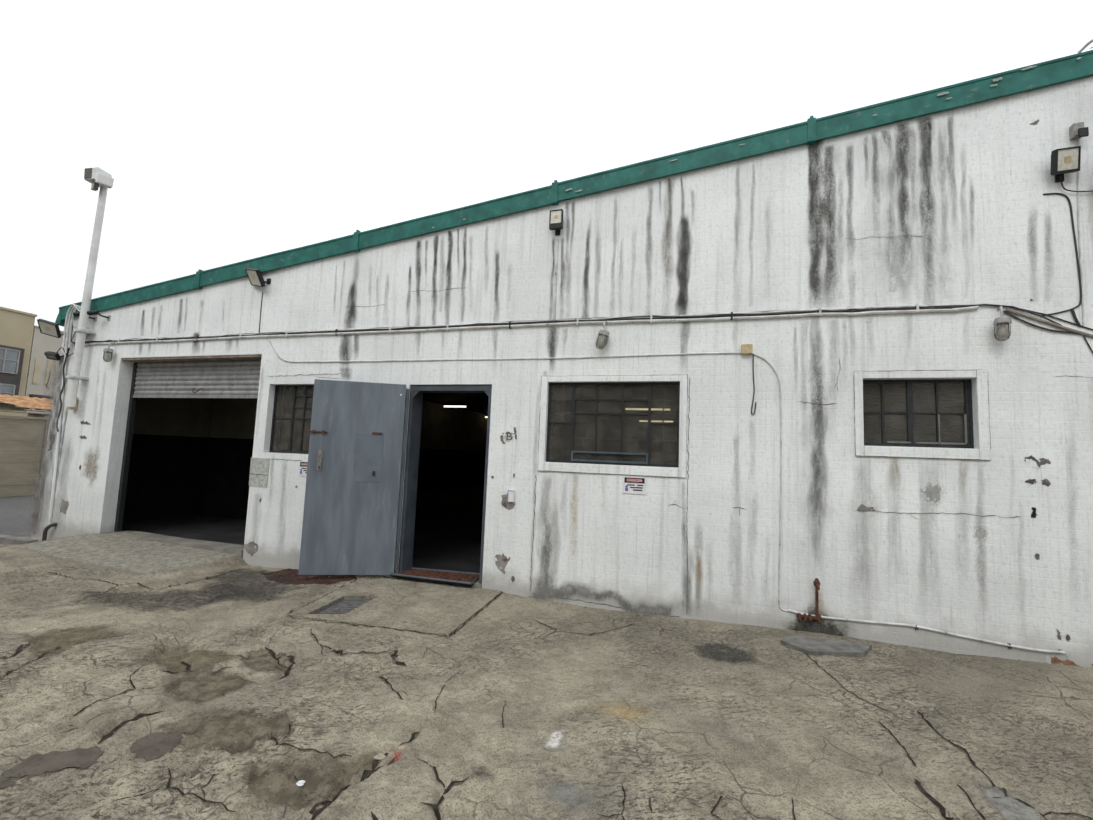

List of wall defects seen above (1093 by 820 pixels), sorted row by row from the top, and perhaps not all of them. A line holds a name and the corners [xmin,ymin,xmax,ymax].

water stain [407,231,466,315]
water stain [665,179,690,325]
water stain [809,140,834,298]
water stain [890,124,908,239]
water stain [920,118,932,222]
flaking render [495,553,515,582]
water stain [532,583,671,616]
crack [71,661,193,744]
crack [167,768,236,812]
crack [271,732,389,820]
crack [436,777,469,820]
crack [805,653,1047,820]